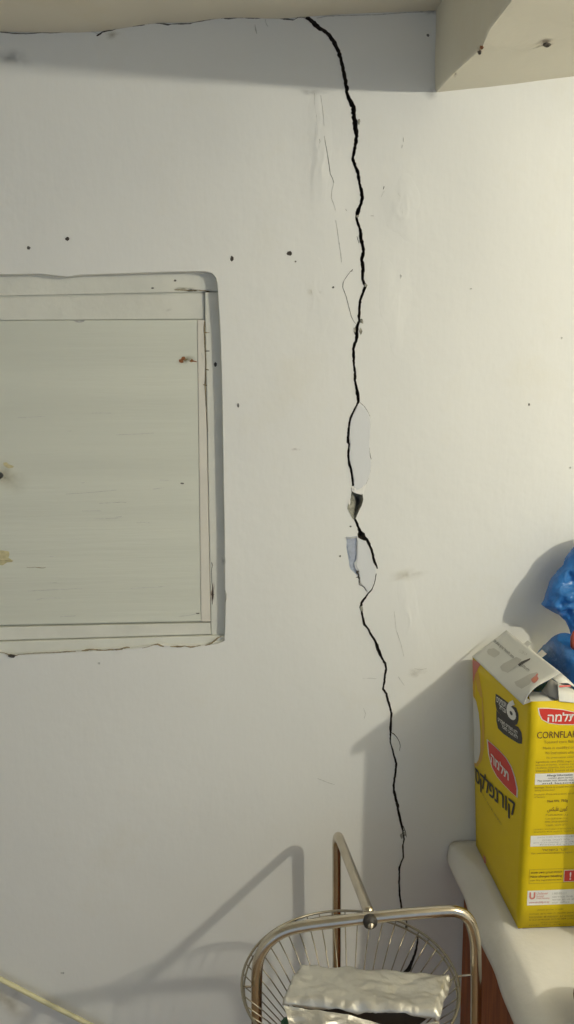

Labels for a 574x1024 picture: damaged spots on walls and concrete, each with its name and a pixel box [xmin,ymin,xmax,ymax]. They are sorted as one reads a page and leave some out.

crack [95,11,434,491]
peeling [347,404,371,519]
peeling [346,536,376,592]
crack [354,519,427,972]